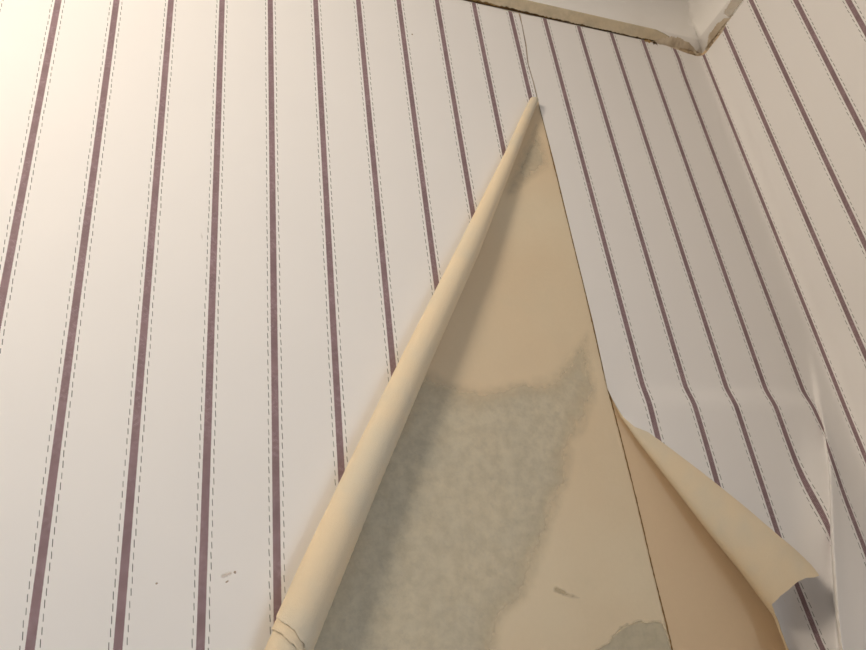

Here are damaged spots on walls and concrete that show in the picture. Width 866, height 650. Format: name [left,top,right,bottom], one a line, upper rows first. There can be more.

damp [314,356,589,650]
flaking render [599,622,670,650]